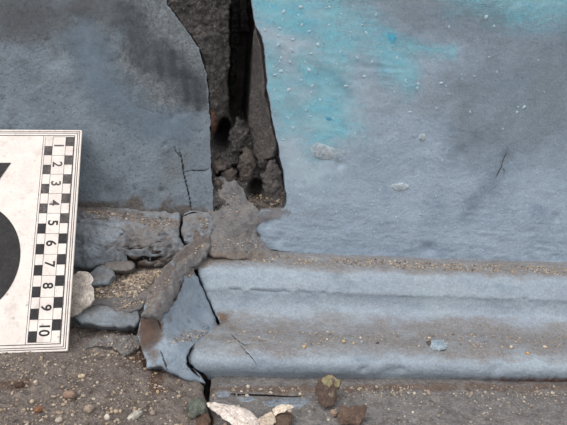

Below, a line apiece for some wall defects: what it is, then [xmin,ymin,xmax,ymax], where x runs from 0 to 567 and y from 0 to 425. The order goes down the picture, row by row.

spalling [107,0,286,212]
leakage [252,0,358,188]
crack [174,147,209,246]
flaking render [70,207,218,387]
crack [186,344,209,388]